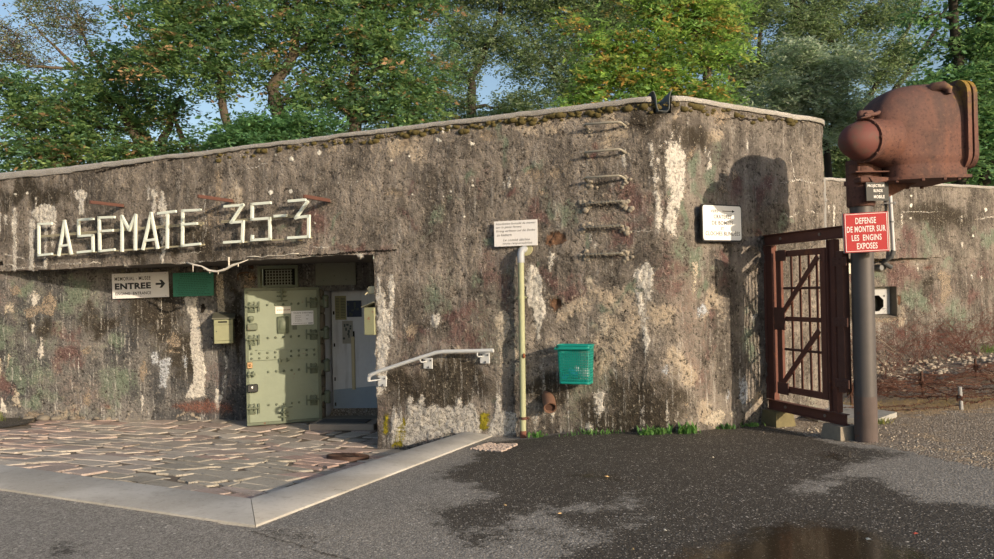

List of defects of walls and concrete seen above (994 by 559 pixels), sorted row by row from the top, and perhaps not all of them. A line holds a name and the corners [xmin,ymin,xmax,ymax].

water stain [151,352,171,389]
water stain [184,253,299,411]